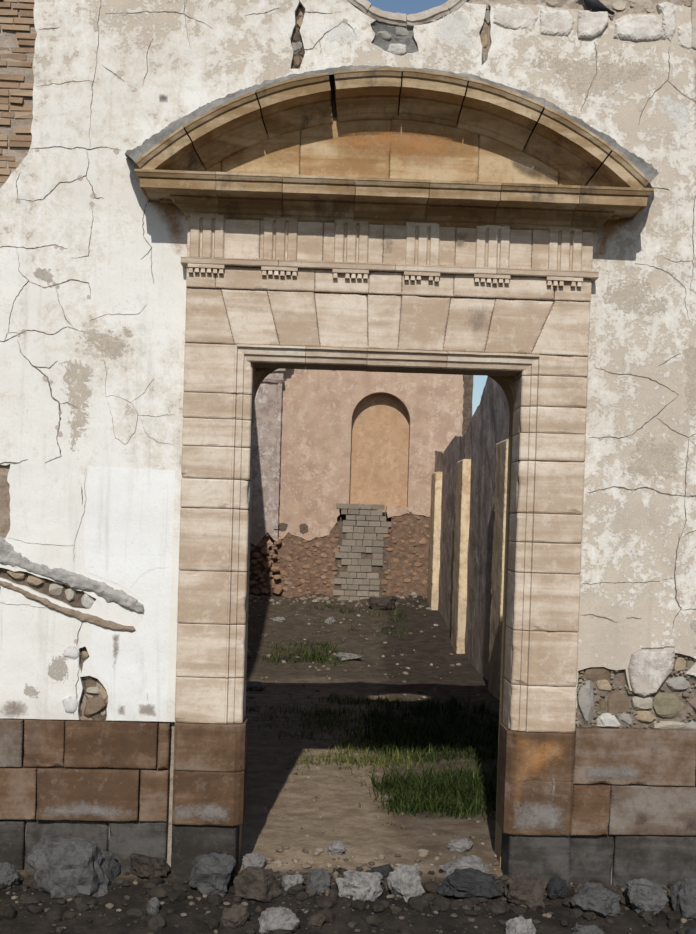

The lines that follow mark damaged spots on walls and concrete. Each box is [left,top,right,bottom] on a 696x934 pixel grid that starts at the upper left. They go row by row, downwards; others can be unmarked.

spalling [371,21,418,56]
flaking render [0,0,37,183]
crack [639,47,696,123]
crack [0,0,209,464]
crack [635,196,696,315]
spalling [0,465,10,538]
crack [582,353,696,649]
peeling [48,654,68,685]
spalling [80,647,108,720]
spalling [575,646,696,730]